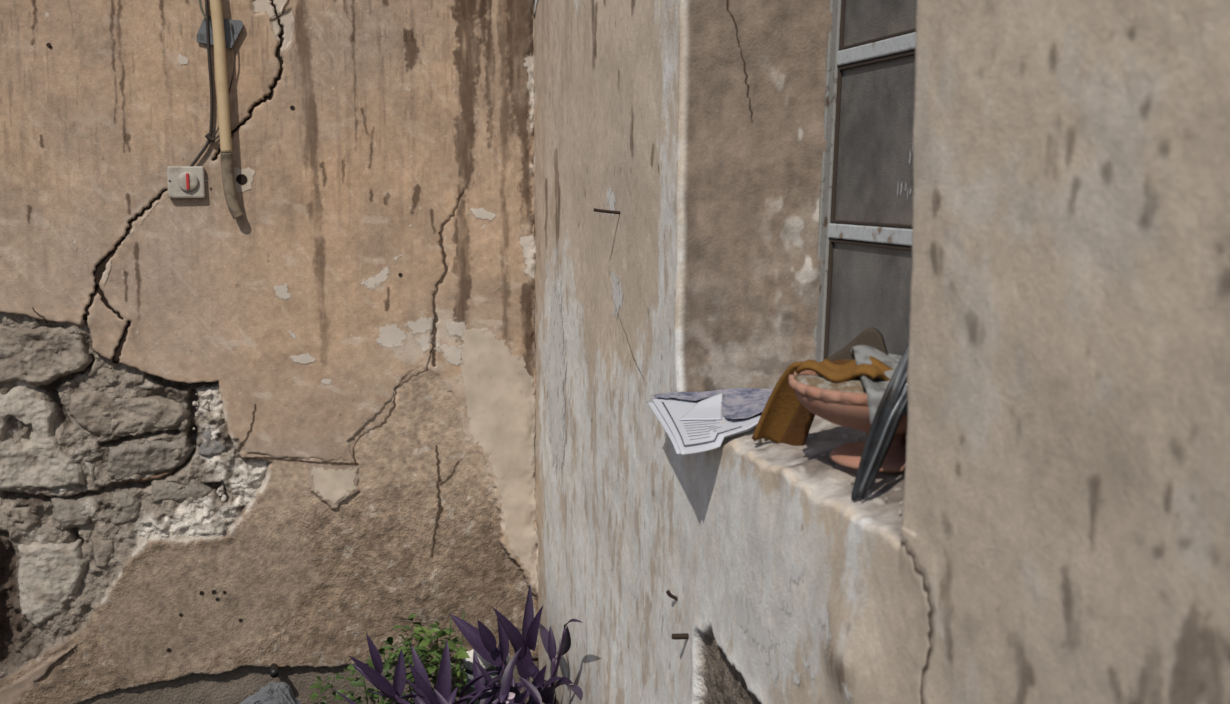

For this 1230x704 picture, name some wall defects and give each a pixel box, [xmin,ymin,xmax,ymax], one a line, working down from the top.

crack [212,0,295,161]
leakage [452,0,534,207]
crack [83,189,167,364]
leakage [124,243,141,302]
peeling [274,283,290,299]
crack [233,189,464,465]
peeling [361,255,403,290]
leakage [454,225,471,323]
leakage [521,284,533,376]
flaking render [0,312,538,704]
crack [431,445,459,557]
crack [900,535,933,704]